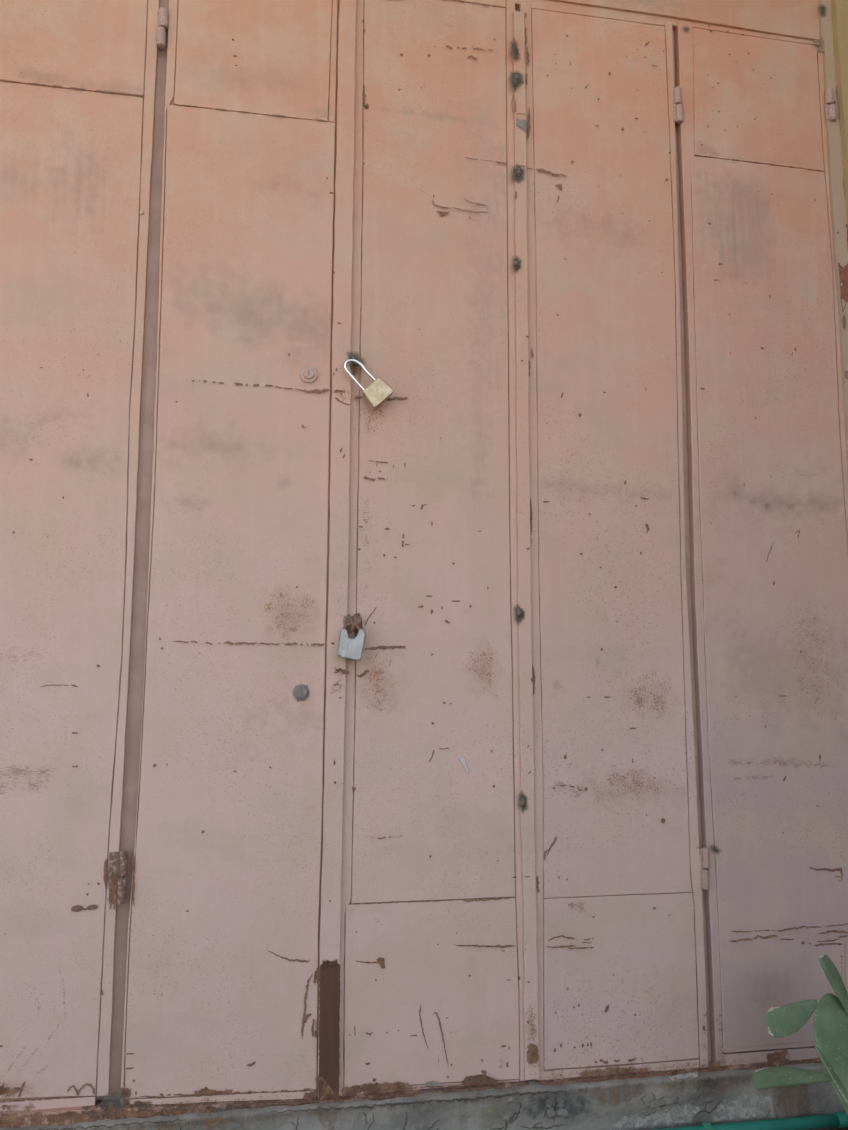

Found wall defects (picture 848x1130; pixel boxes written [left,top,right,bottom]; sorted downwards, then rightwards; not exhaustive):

peeling [838,262,848,329]
rust [192,380,362,405]
rust [159,593,335,650]
rust [71,857,119,912]
rust [730,923,848,978]
rust [526,1008,821,1089]
crack [39,1119,185,1130]
rust [0,1082,318,1128]
crack [268,1091,568,1130]
rust [338,1070,513,1106]